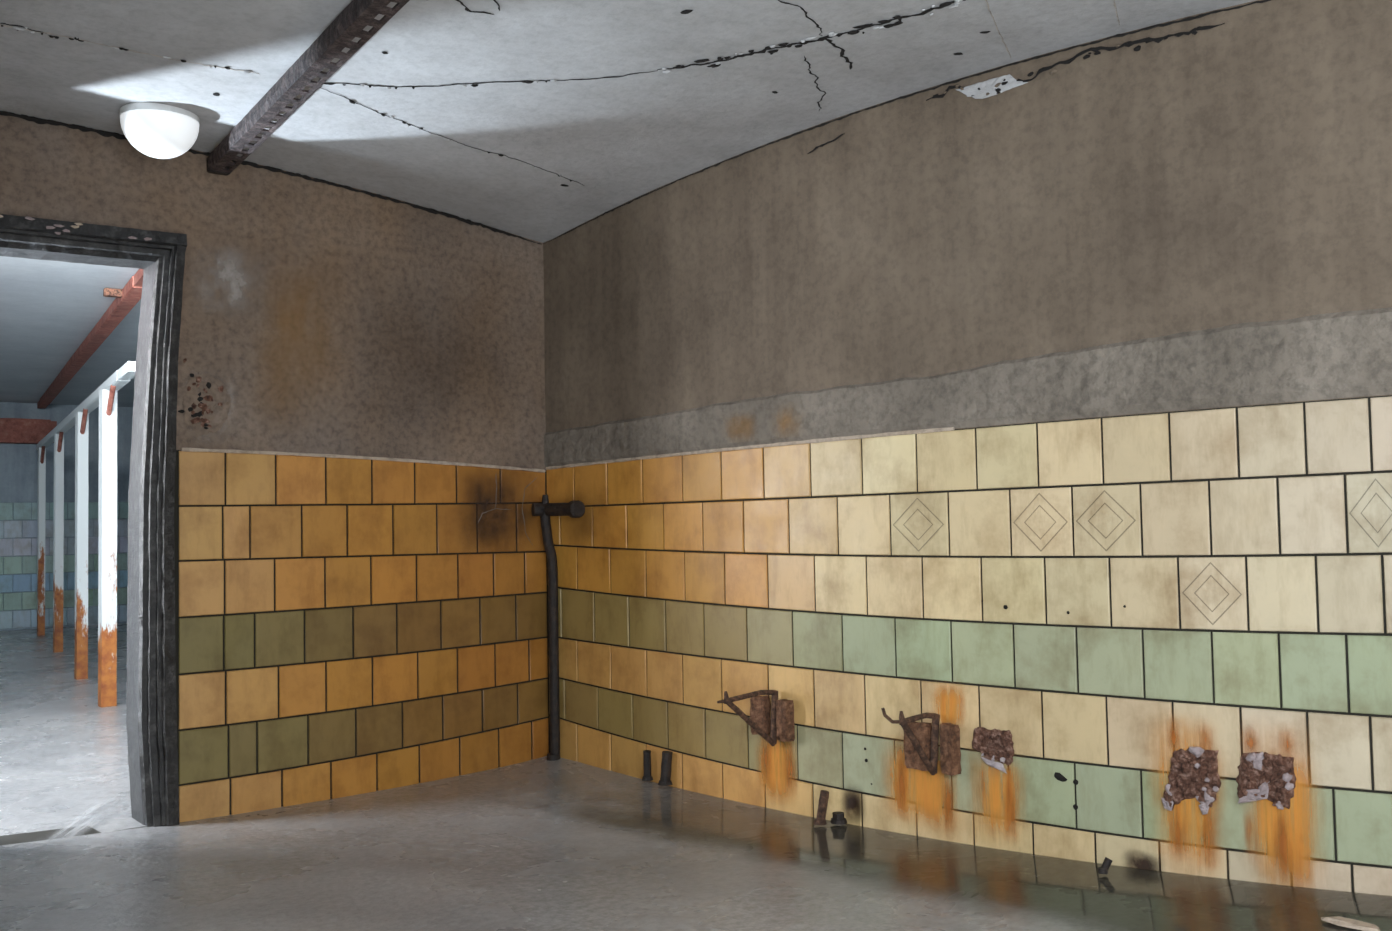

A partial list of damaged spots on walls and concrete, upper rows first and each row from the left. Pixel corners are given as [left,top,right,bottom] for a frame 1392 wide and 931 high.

peeling [956,74,1028,99]
crack [0,111,127,140]
crack [188,0,1271,244]
rust [936,689,961,724]
rust [890,749,952,823]
rust [982,767,1016,832]
rust [1167,798,1212,857]
rust [1247,767,1312,879]